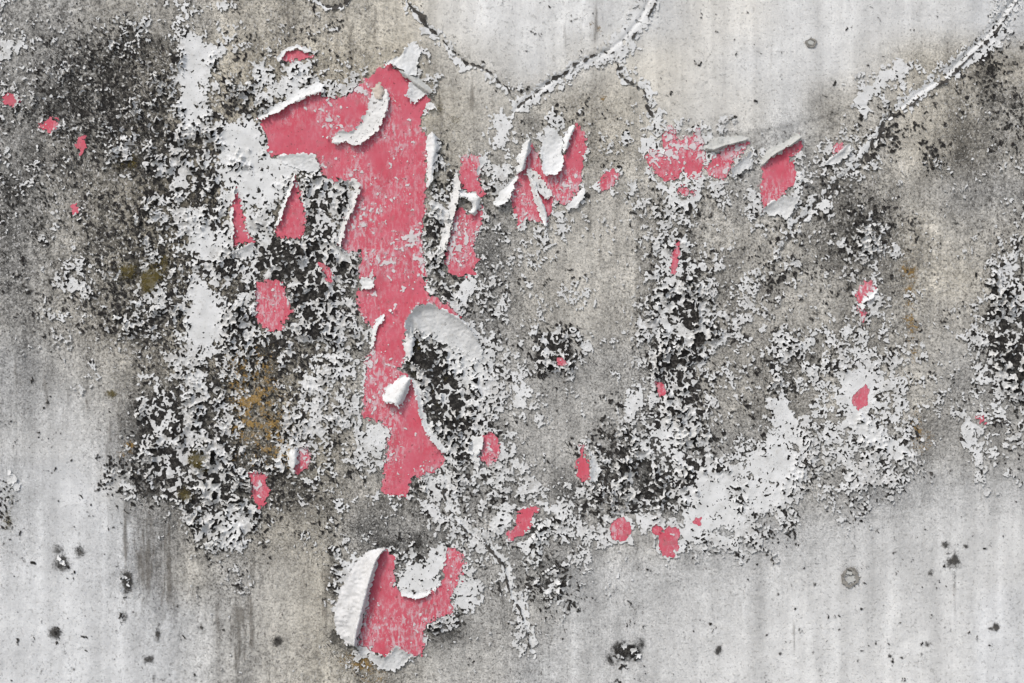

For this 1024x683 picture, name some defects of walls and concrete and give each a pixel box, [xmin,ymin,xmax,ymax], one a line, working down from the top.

damp [0,16,214,221]
crack [401,0,667,135]
peeling [508,0,657,111]
crack [778,0,1022,250]
damp [927,45,1024,185]
peeling [557,269,596,310]
damp [797,184,913,277]